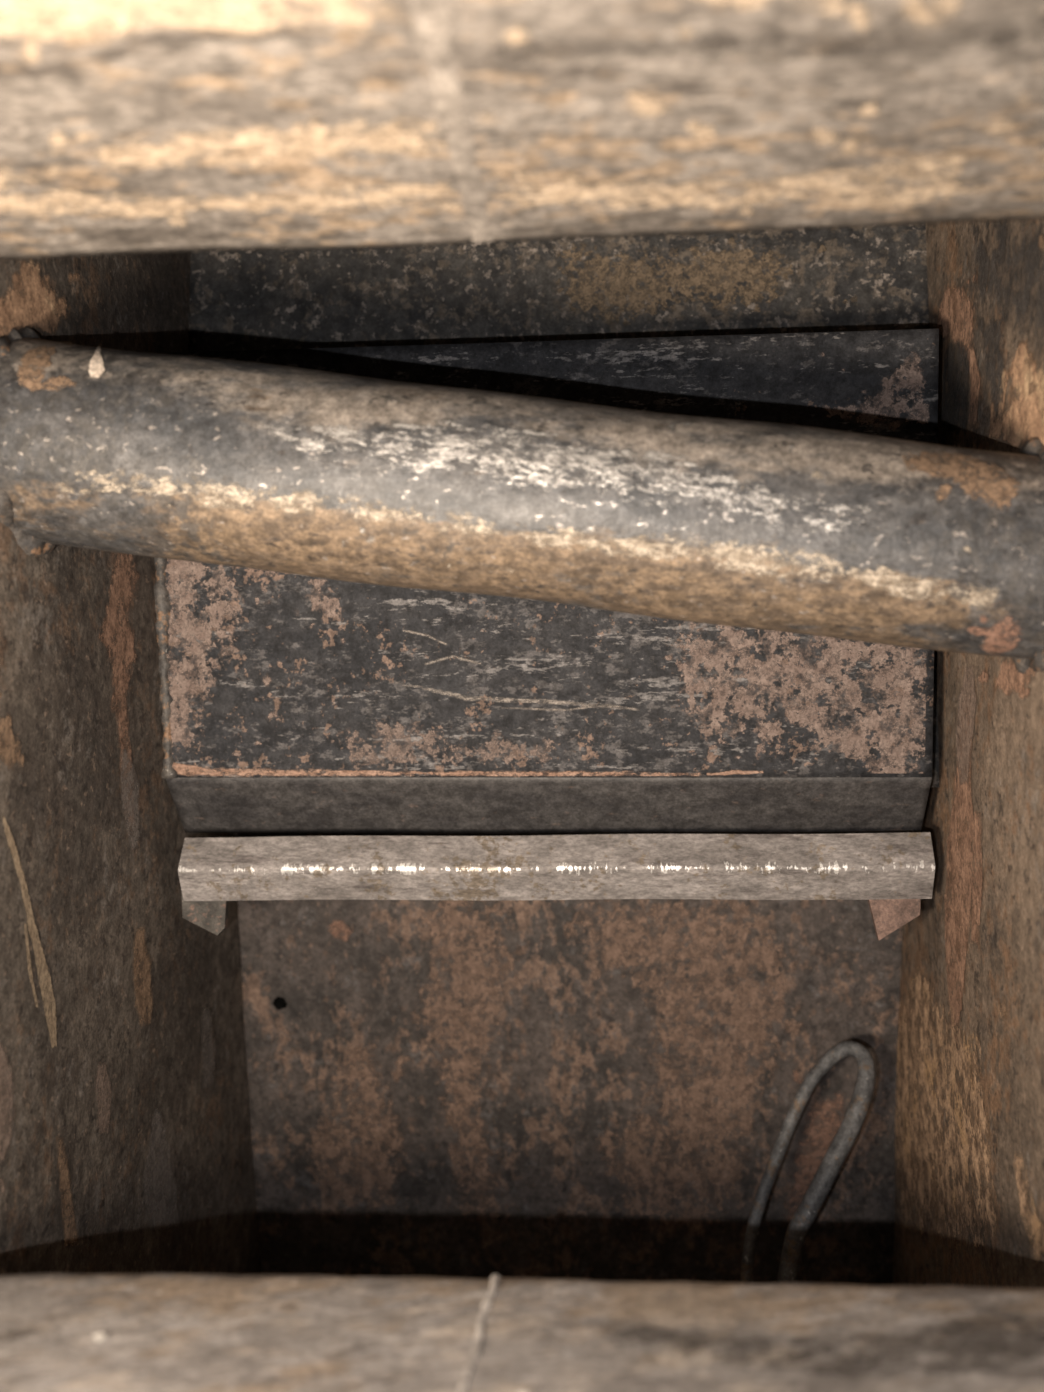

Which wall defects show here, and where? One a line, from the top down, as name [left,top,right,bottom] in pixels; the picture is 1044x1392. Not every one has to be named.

corrosion [306,900,527,1222]
corrosion [564,899,802,1229]
corrosion [783,1094,844,1226]